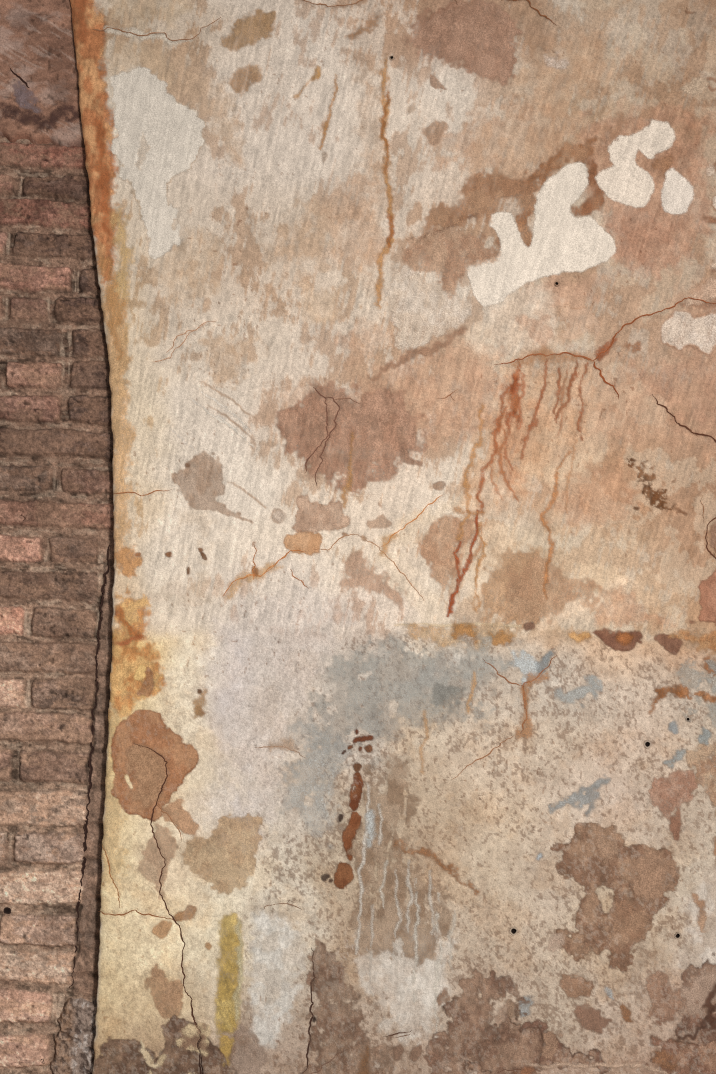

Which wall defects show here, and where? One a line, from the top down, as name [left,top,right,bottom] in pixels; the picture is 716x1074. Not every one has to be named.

peeling [109,67,205,260]
corrosion [376,57,394,306]
peeling [374,113,694,380]
crack [494,297,716,399]
peeling [661,255,716,356]
crack [305,387,360,484]
corrosion [408,361,588,650]
crack [69,545,204,1074]
crack [255,739,303,757]
corrosion [321,729,373,889]
spalling [50,921,267,1074]
crack [303,950,346,1074]